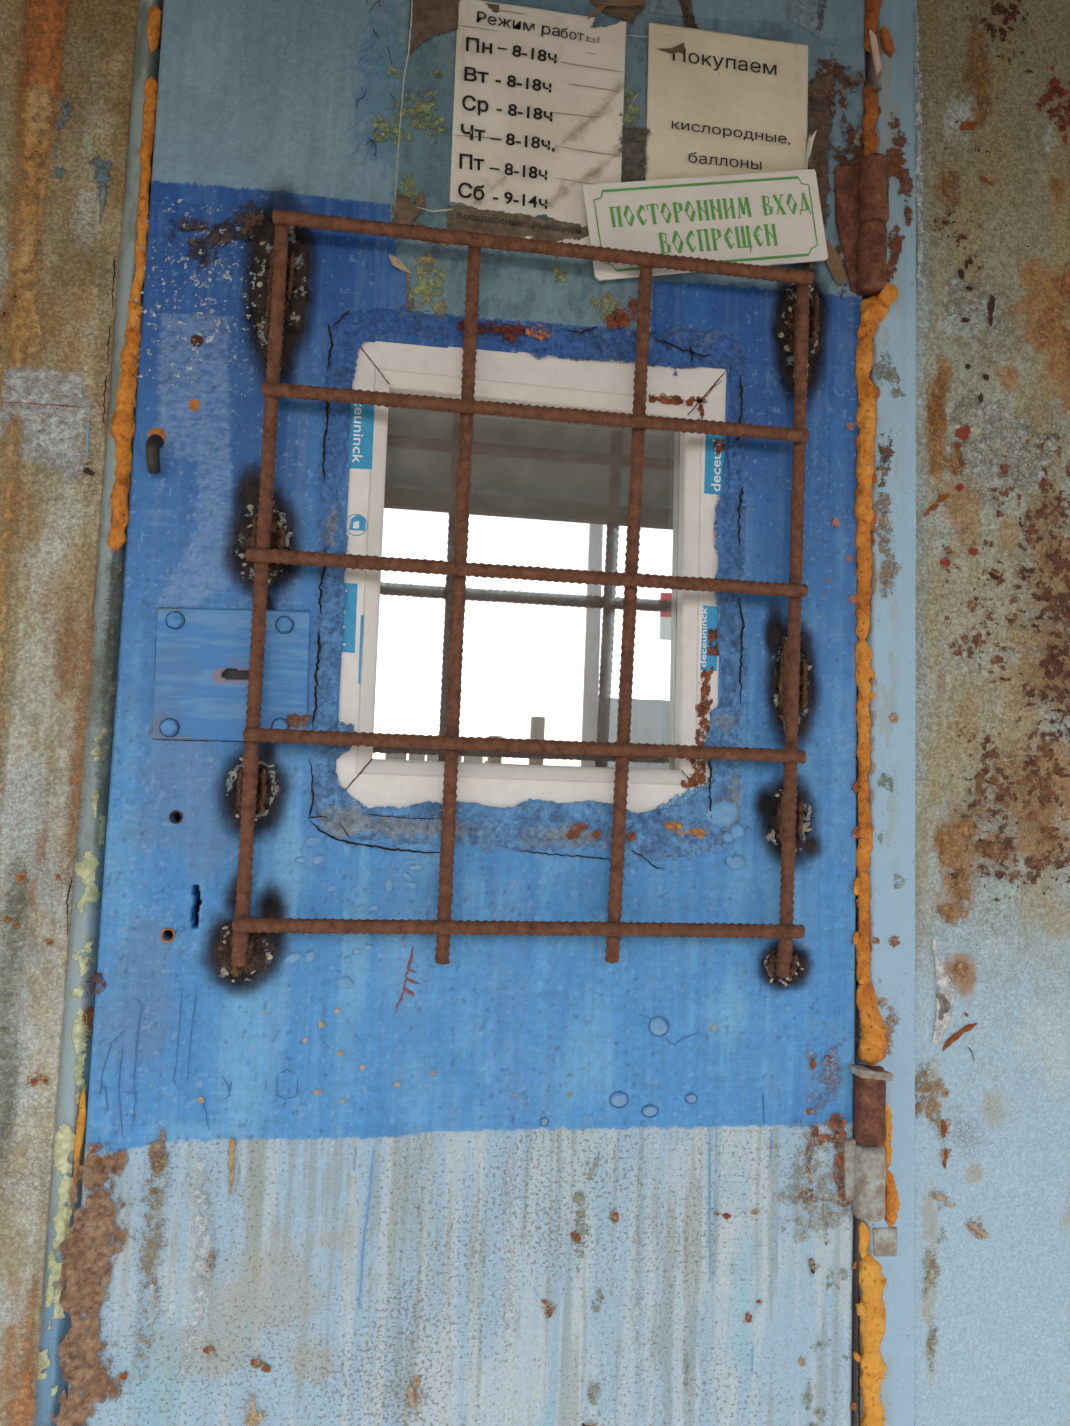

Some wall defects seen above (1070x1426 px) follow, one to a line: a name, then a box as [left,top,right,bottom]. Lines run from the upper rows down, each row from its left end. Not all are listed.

rust [885,112,914,283]
rust [0,0,72,805]
crack [736,375,744,441]
crack [736,487,744,547]
rust [922,370,966,517]
rust [55,616,97,885]
rust [681,628,719,789]
crack [706,760,714,820]
crack [737,598,745,705]
rust [933,816,983,926]
rust [769,1038,852,1246]
rust [5,1128,173,1426]